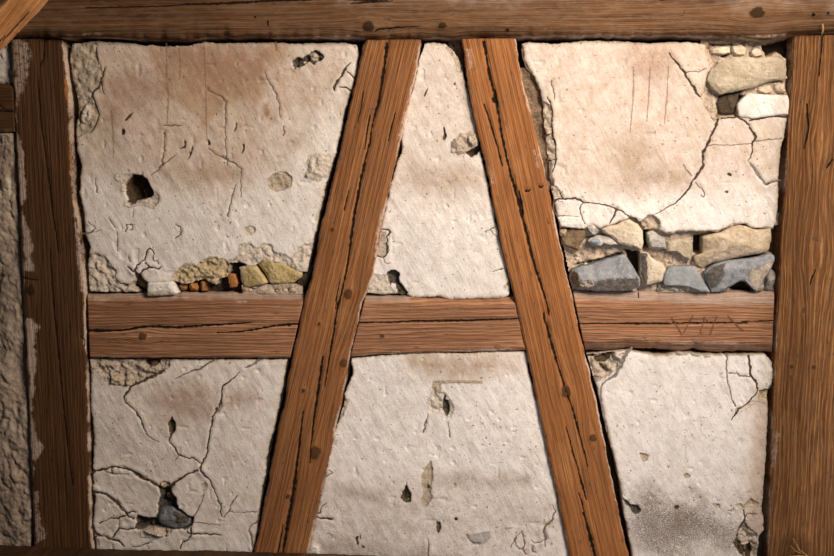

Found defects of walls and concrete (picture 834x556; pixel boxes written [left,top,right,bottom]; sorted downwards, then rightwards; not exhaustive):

crack [79,43,106,134]
spalling [113,173,133,192]
crack [82,124,182,286]
spalling [124,194,158,209]
spalling [641,215,687,234]
spalling [172,226,313,284]
crack [81,322,299,347]
crack [278,26,419,553]
crack [358,316,519,324]
crack [482,41,810,556]
crack [91,358,260,549]
spalling [733,524,758,556]